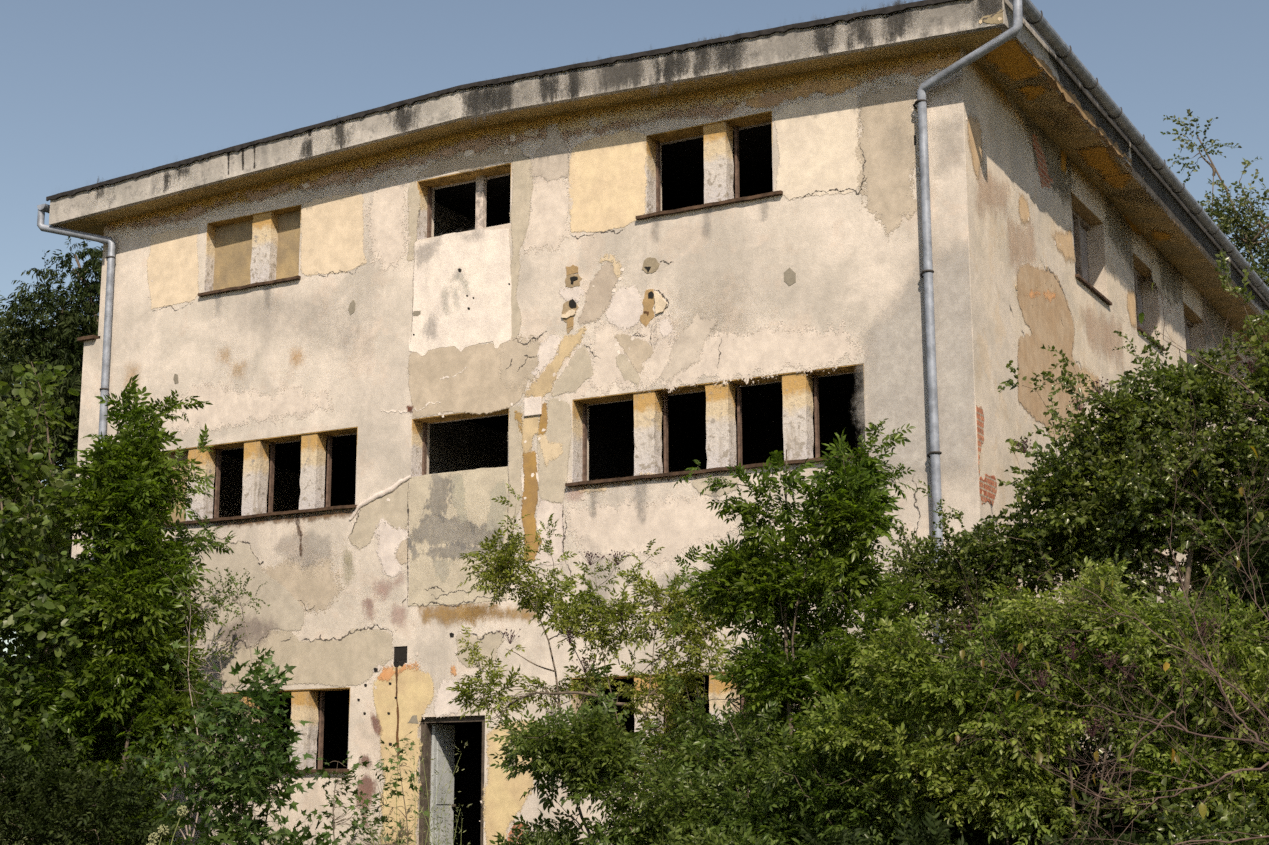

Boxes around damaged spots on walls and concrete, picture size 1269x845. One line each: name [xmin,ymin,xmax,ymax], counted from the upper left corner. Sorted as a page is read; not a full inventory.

leakage [815,17,870,51]
leakage [107,39,1183,300]
crack [792,142,867,199]
flaking render [1005,92,1071,193]
spalling [1016,39,1132,165]
flaking render [107,50,997,567]
flaking render [1015,262,1083,441]
leakage [1086,309,1122,358]
leakage [408,475,507,582]
flaking render [184,526,505,845]